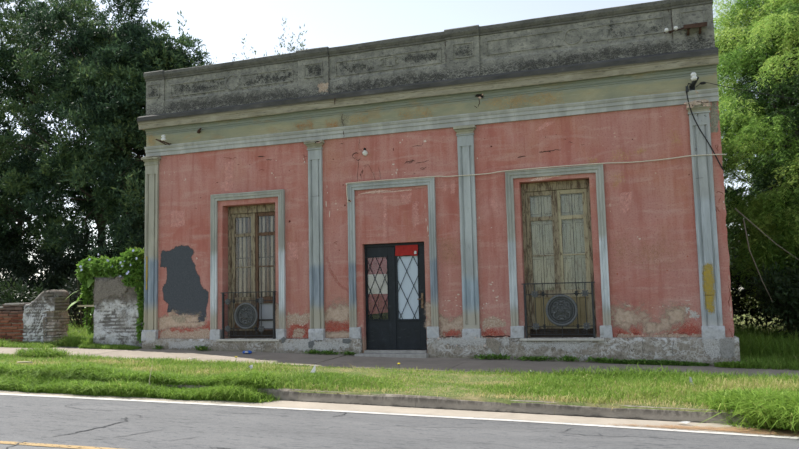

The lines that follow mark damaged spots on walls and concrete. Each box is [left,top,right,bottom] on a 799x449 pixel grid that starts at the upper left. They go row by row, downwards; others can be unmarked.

peeling [145,317,211,349]
peeling [280,311,351,352]
peeling [427,282,596,353]